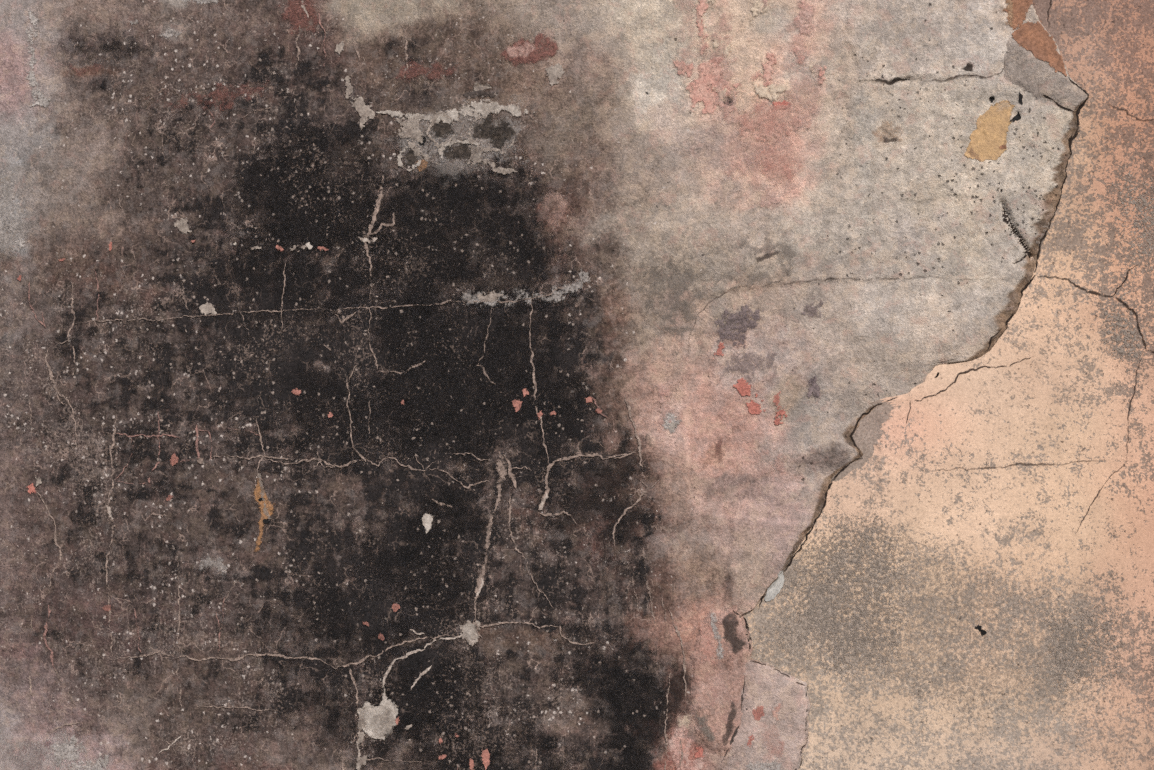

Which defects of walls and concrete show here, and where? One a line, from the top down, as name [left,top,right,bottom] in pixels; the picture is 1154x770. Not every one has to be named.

spalling [345,76,535,175]
water stain [501,33,558,67]
crack [856,66,1005,85]
peeling [965,0,1086,162]
efflorescence [463,270,590,306]
crack [722,78,1154,761]
corrosion [254,474,274,552]
crack [28,175,660,770]
crack [632,547,687,770]
water stain [1046,607,1124,688]
spalling [356,679,412,770]
peeling [722,660,809,770]